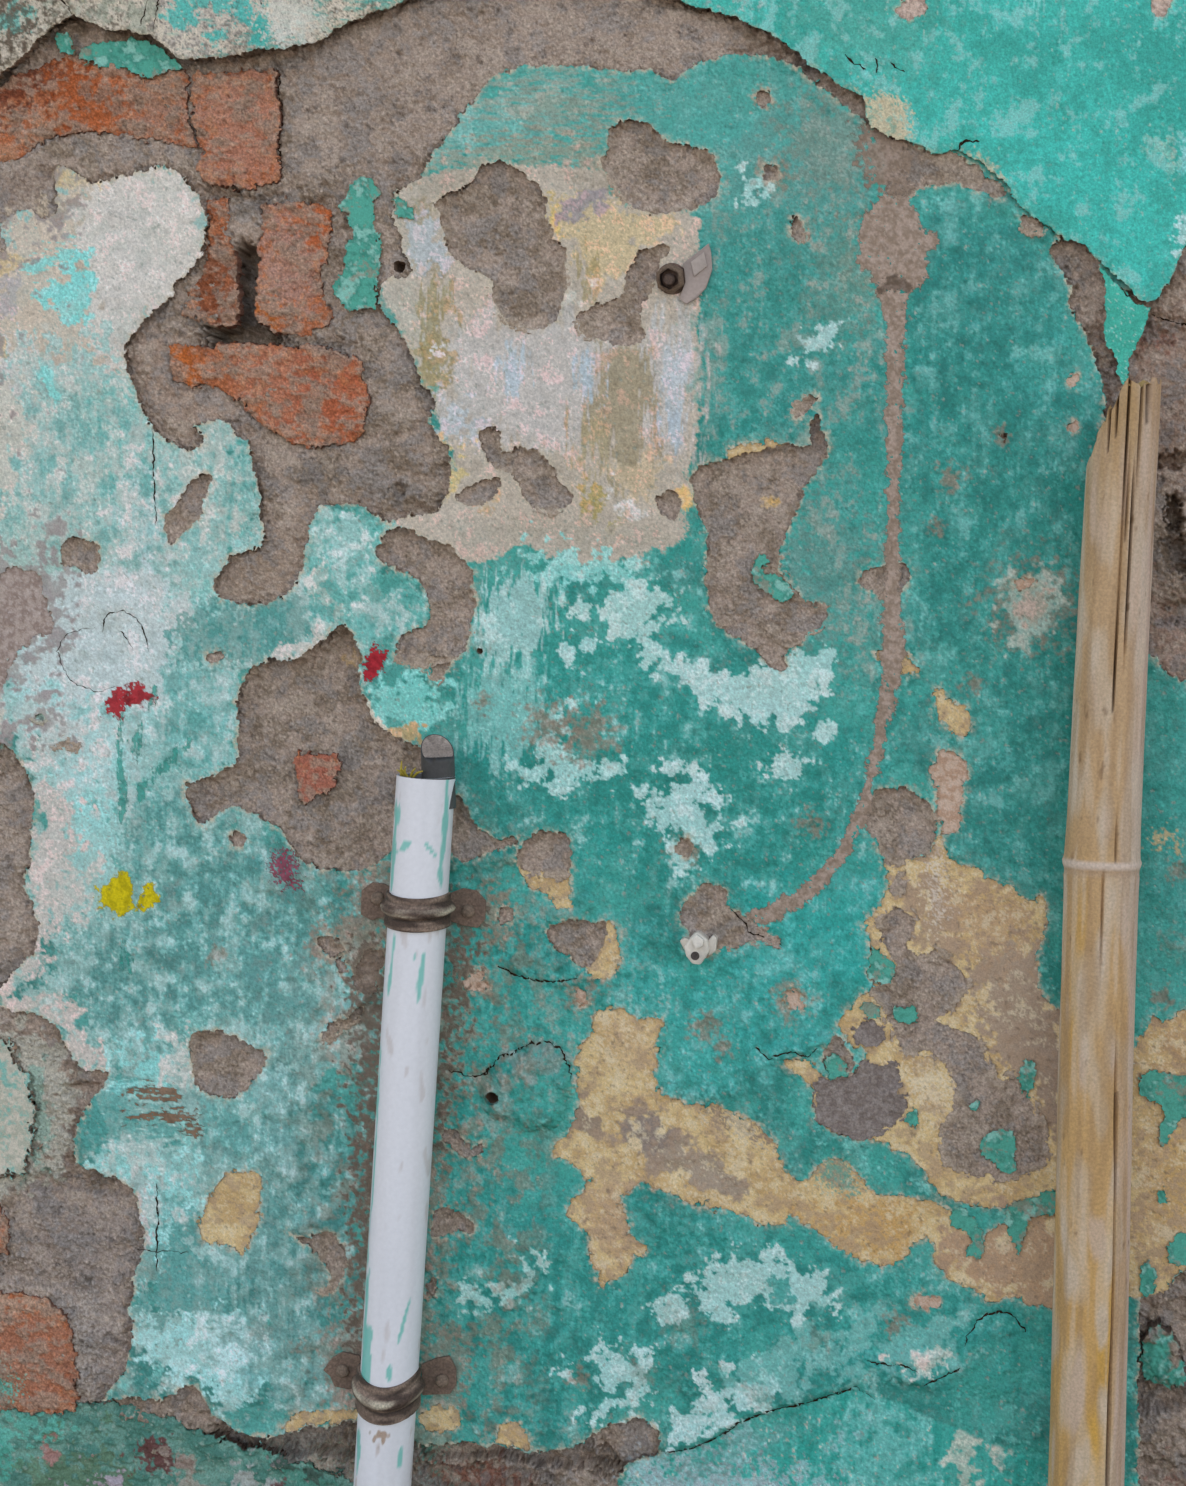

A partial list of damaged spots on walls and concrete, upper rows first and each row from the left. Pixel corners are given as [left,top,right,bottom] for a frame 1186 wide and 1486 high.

flaking render [0,0,1006,691]
spalling [50,734,82,754]
spalling [185,624,421,871]
spalling [0,744,41,988]
spalling [317,936,385,1045]
peeling [451,689,1060,1309]
spalling [442,1128,484,1162]
spalling [0,1007,358,1483]
spalling [431,1207,474,1244]
peeling [912,1293,941,1313]
spalling [411,1404,661,1486]
crack [661,1310,1026,1453]